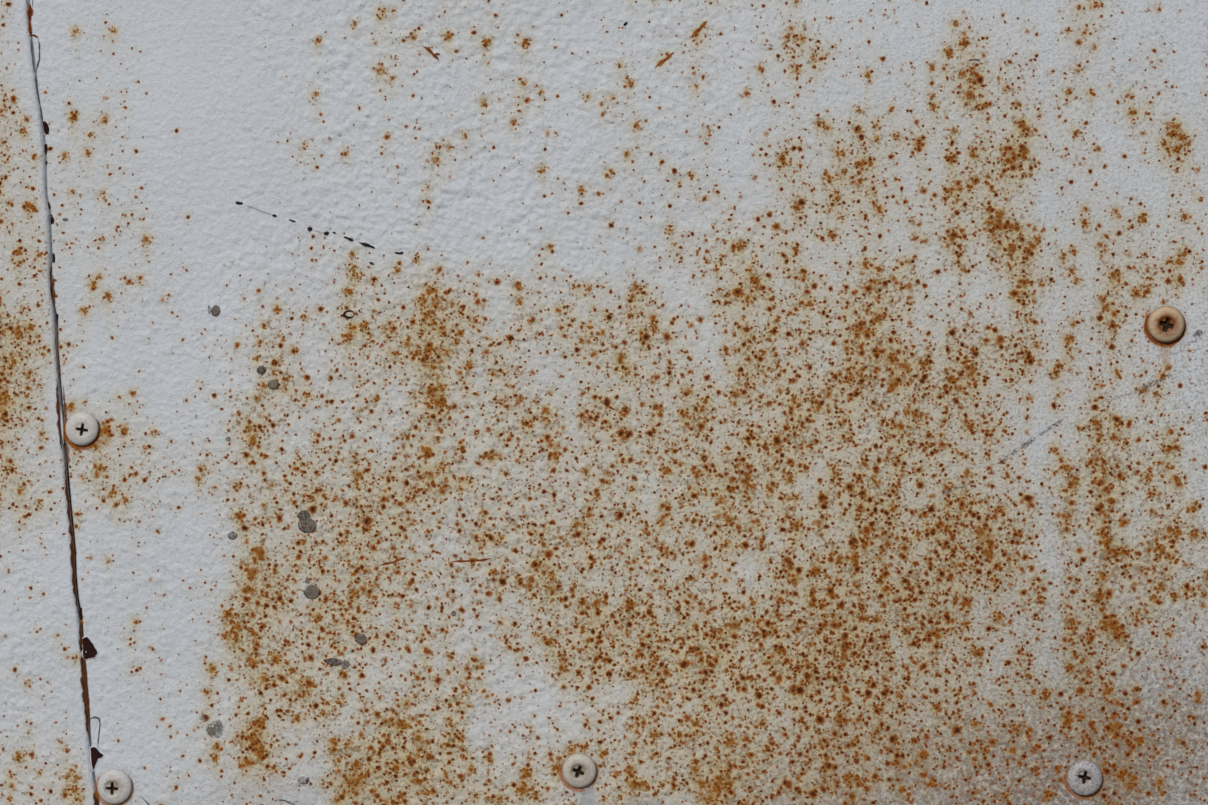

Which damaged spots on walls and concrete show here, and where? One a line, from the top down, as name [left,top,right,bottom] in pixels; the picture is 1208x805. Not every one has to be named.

corrosion [645,57,721,145]
corrosion [742,0,851,112]
corrosion [1050,1,1127,122]
corrosion [1109,81,1204,173]